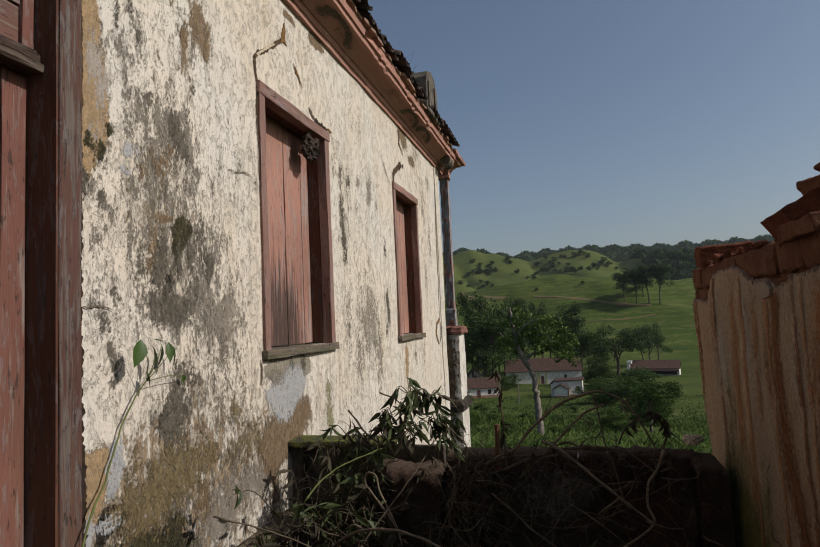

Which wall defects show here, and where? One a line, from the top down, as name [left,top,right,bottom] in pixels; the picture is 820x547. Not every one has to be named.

mould [83,122,115,161]
spalling [82,0,138,200]
leakage [112,0,147,55]
leakage [137,103,190,186]
leakage [178,0,214,97]
crack [228,16,303,182]
crack [309,107,332,133]
leakage [136,209,249,372]
leakage [93,354,280,547]
spalling [255,361,313,488]
rust [446,335,458,397]
rust [728,277,820,547]